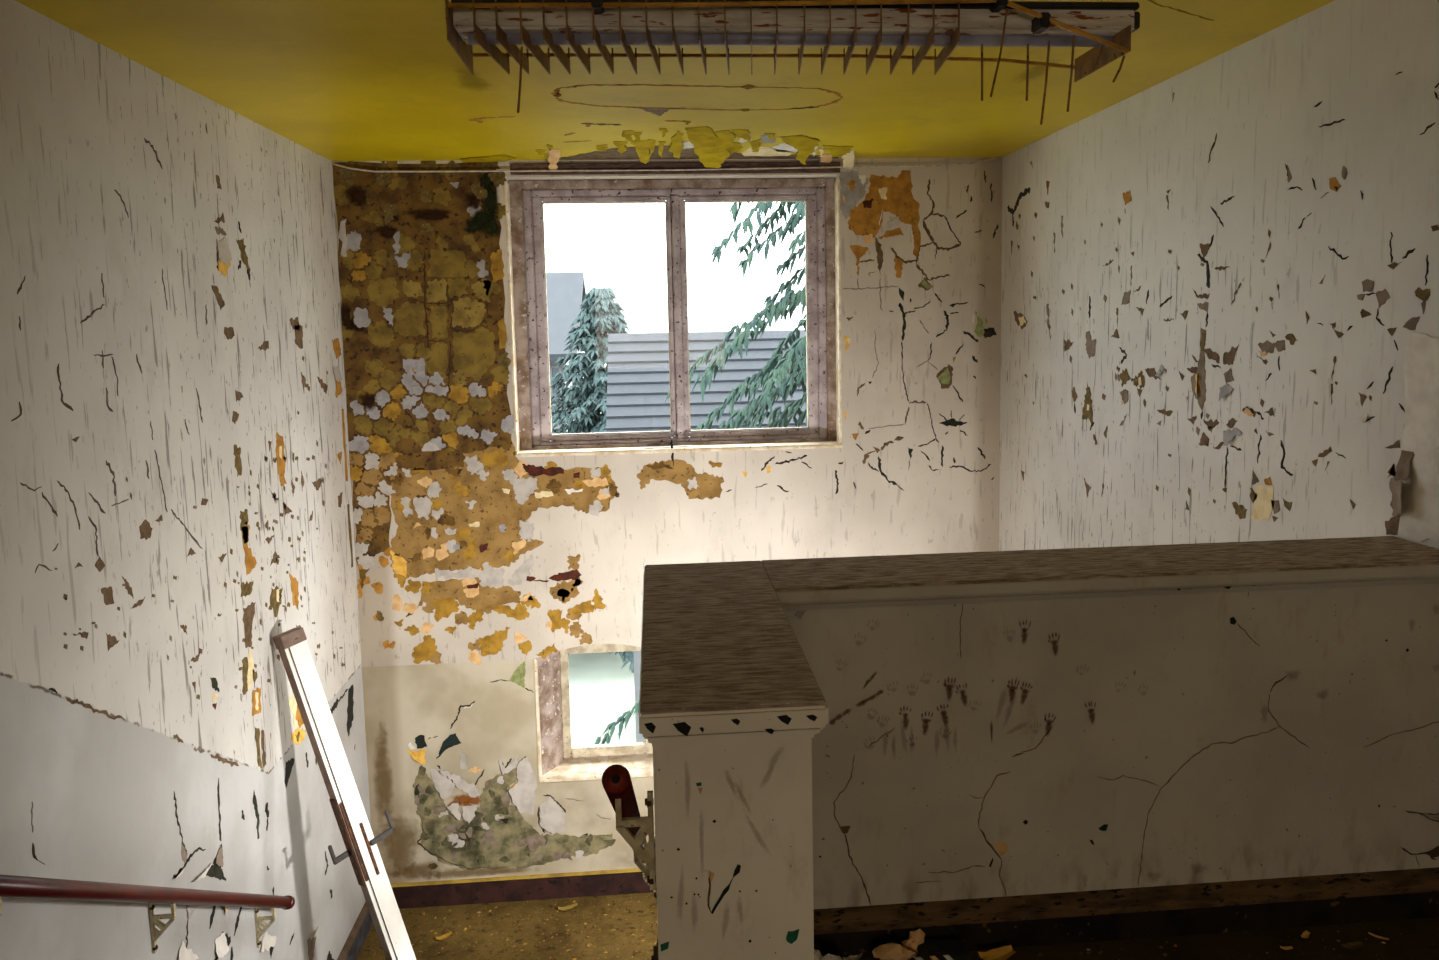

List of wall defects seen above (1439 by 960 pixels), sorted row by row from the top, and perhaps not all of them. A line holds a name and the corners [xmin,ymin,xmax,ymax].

peeling [535,126,921,278]
crack [57,274,142,412]
crack [726,179,994,494]
peeling [1033,235,1298,522]
crack [0,388,203,573]
flaking render [190,155,620,769]
flaking render [637,440,724,500]
crack [48,688,124,720]
crack [173,734,239,767]
damp [376,739,391,814]
damp [384,827,510,877]
flaking render [408,733,616,870]